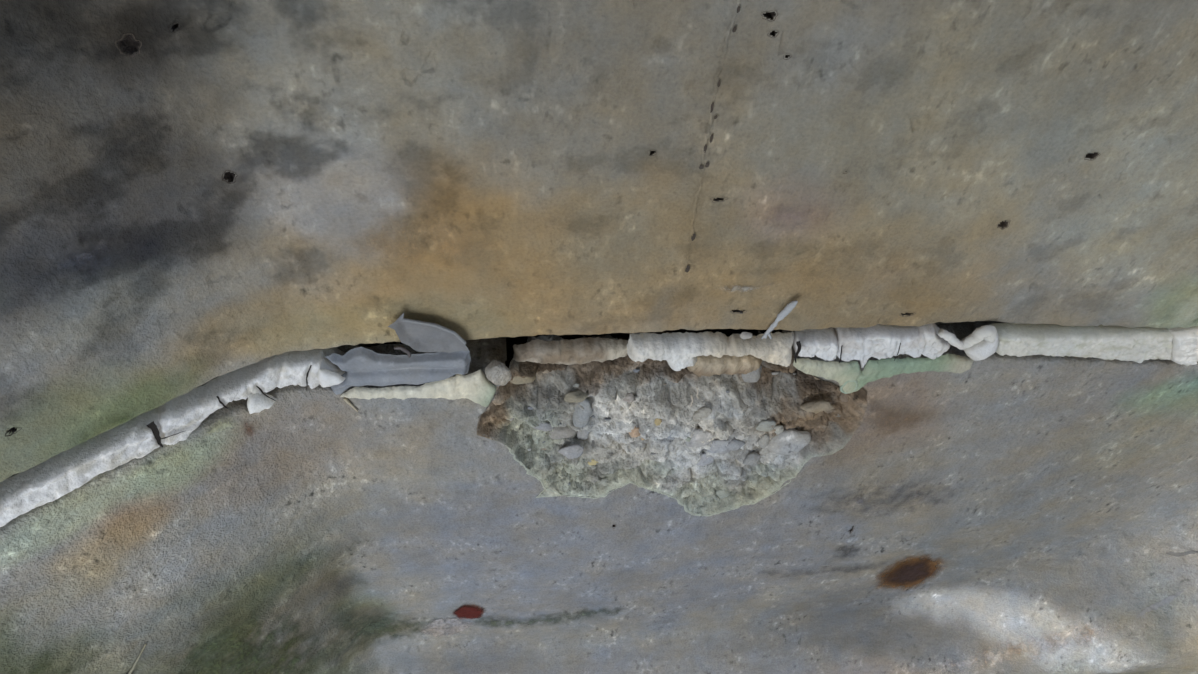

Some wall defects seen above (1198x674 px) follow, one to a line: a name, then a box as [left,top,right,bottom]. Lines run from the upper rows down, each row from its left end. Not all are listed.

spalling [477,334,867,516]
rust [880,557,942,588]
rust [454,605,483,619]